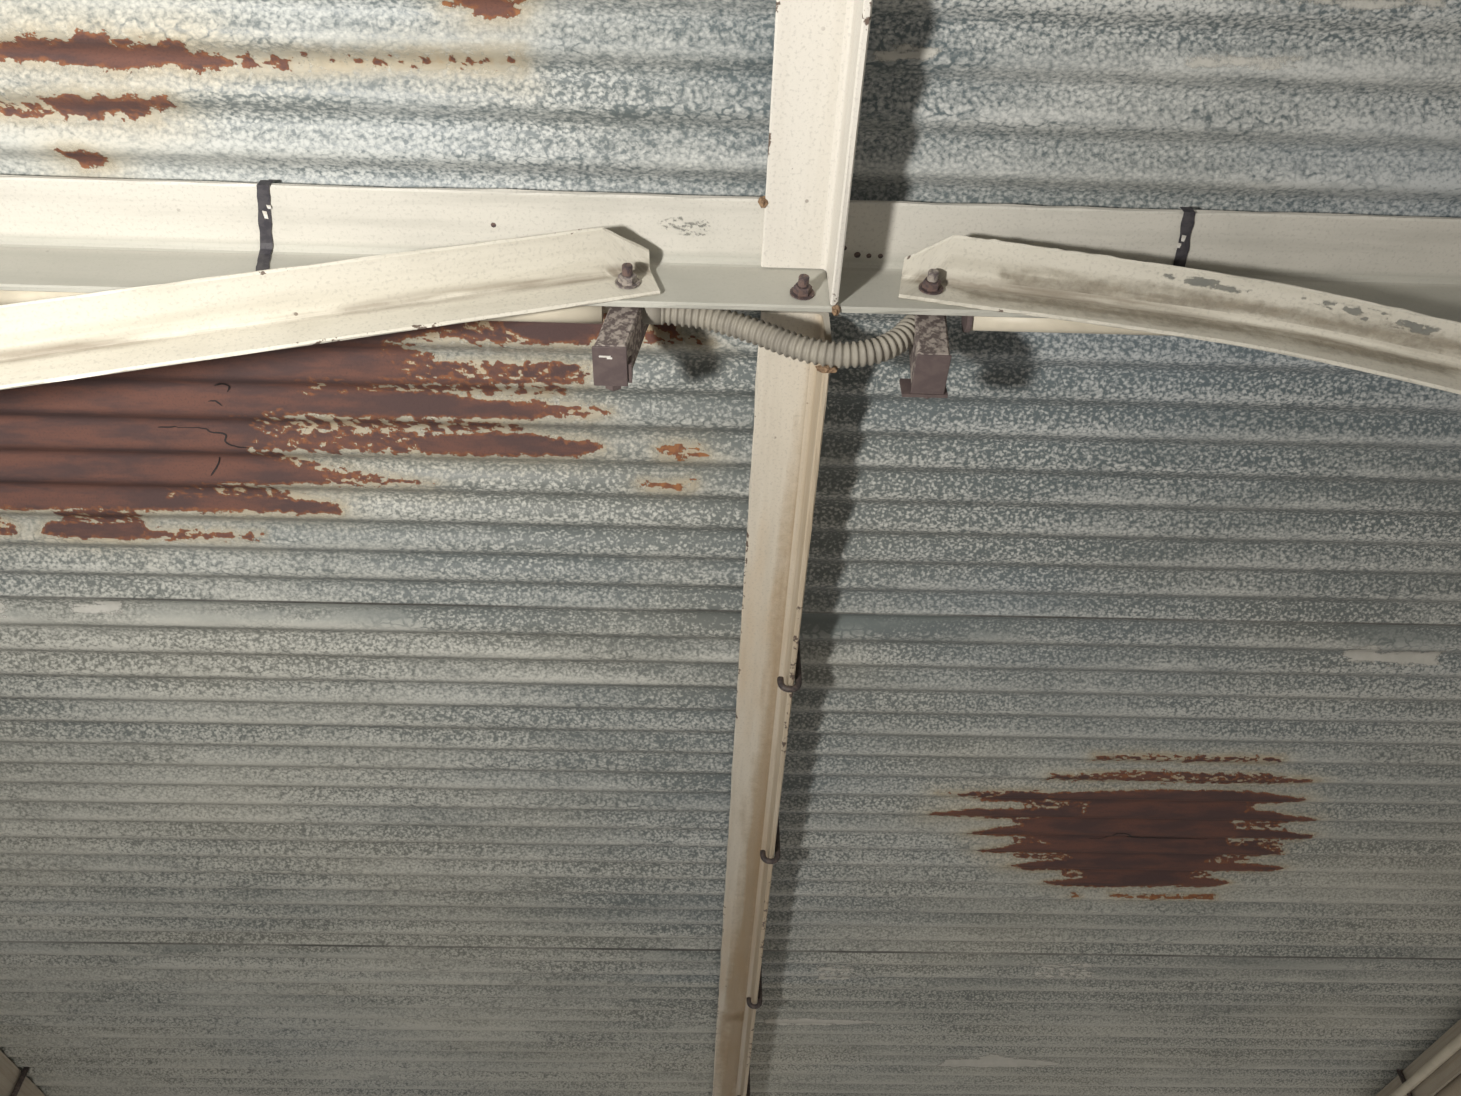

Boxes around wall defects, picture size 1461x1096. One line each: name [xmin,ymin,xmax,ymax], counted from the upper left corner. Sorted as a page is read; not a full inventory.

rust [442,0,528,20]
rust [0,28,520,75]
rust [0,92,177,122]
rust [642,323,712,345]
rust [0,306,611,542]
rust [656,443,709,461]
rust [637,478,697,495]
rust [929,753,1317,901]